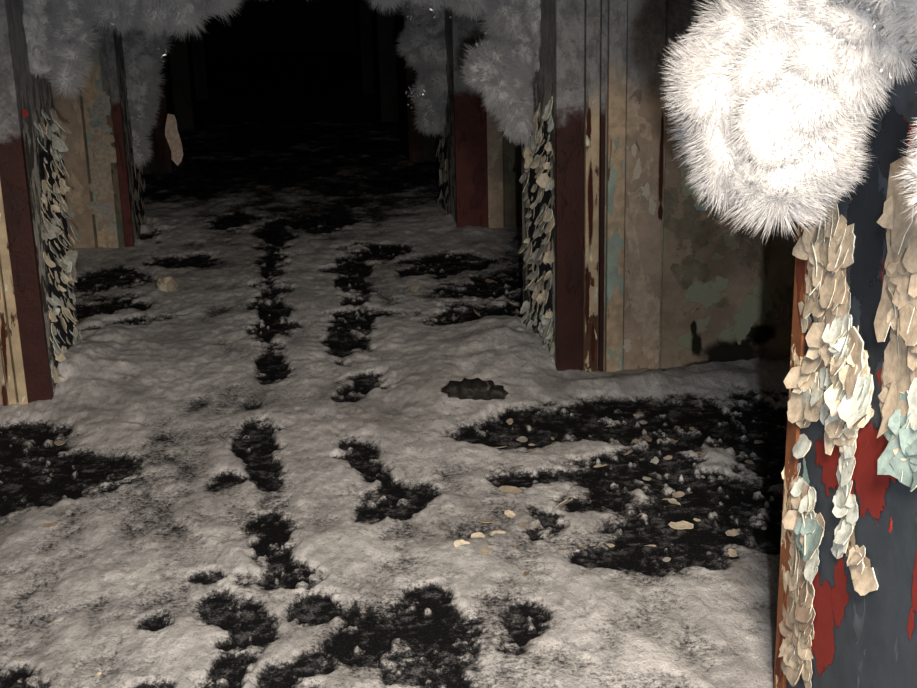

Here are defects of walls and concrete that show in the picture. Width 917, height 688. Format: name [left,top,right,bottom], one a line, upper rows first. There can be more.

peeling [21,108,82,394]
peeling [87,91,117,237]
peeling [509,96,555,362]
peeling [679,156,718,211]
peeling [677,275,730,350]
peeling [718,280,774,345]
peeling [778,104,917,688]